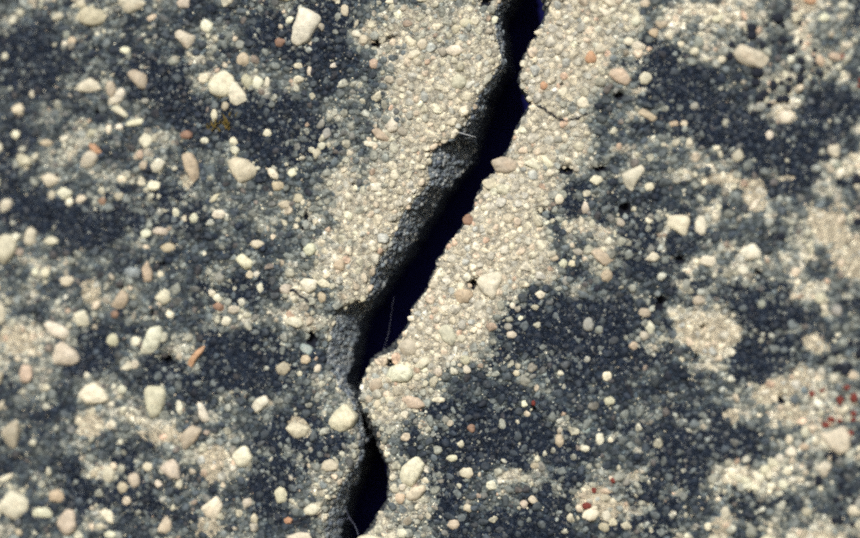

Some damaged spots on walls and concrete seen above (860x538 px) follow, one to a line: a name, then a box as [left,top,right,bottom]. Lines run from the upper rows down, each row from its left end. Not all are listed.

crack [267,288,316,309]
crack [290,0,588,538]